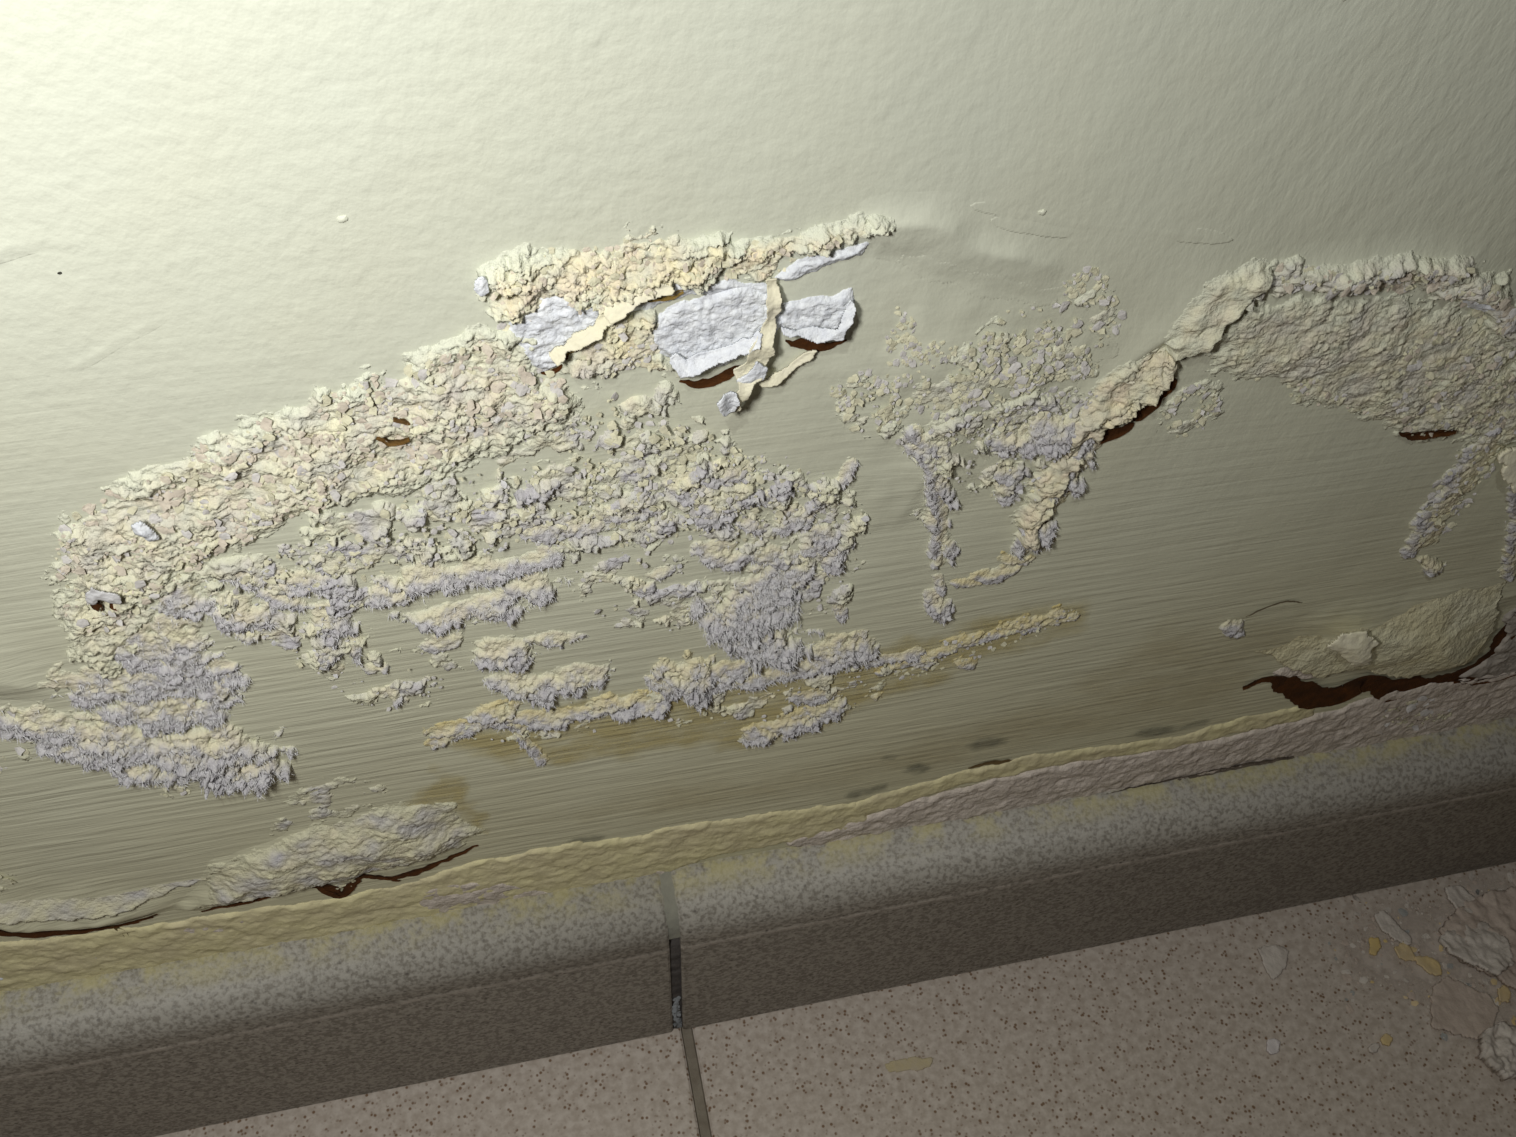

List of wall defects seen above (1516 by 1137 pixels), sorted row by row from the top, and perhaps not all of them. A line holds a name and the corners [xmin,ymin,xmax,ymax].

spalling [40,212,896,679]
damp [0,411,1103,801]
flaking render [786,581,1516,847]
spalling [830,250,1516,551]
damp [1399,428,1506,578]
damp [1496,485,1516,582]